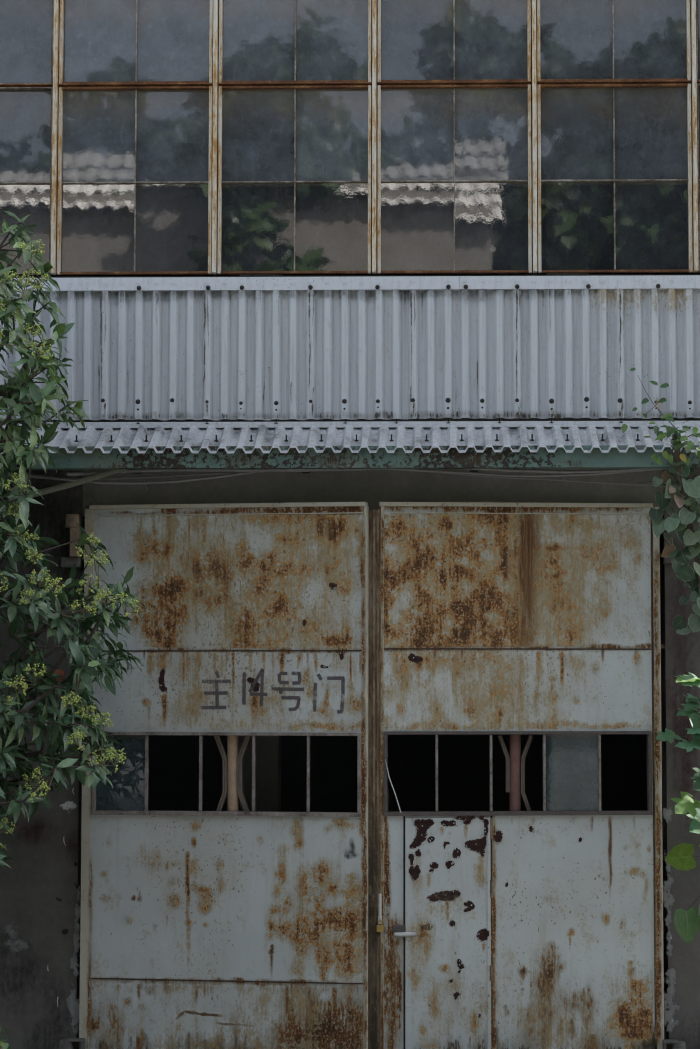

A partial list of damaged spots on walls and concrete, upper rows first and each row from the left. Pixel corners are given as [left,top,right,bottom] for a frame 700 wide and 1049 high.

corrosion [112,501,663,1049]
peeling [408,816,503,880]
peeling [426,890,475,912]
corrosion [86,861,220,1049]
peeling [450,959,465,1000]
peeling [476,928,490,941]